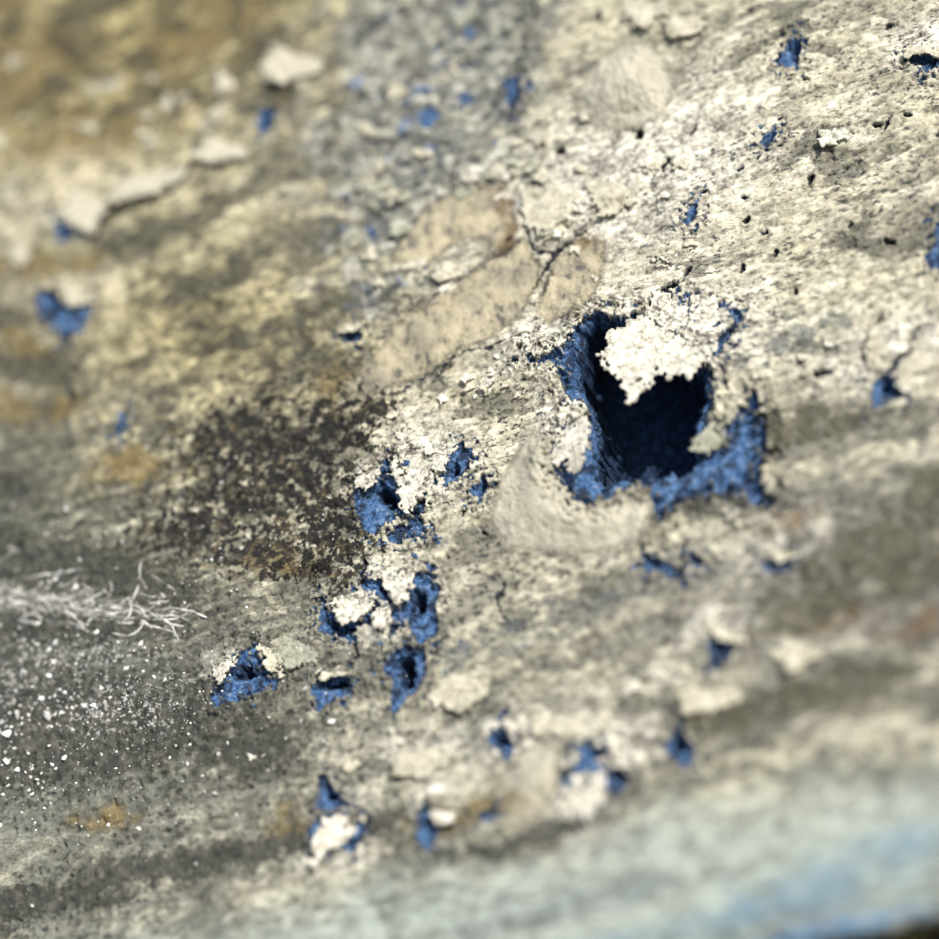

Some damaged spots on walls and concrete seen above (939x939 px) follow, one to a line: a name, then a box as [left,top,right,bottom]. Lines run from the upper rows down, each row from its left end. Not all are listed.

spalling [763,18,813,82]
spalling [893,39,939,86]
peeling [40,41,324,252]
crack [391,162,499,257]
crack [398,252,494,317]
crack [526,231,586,289]
crack [63,375,86,446]
crack [385,328,539,396]
spalling [337,114,791,593]
peeling [819,323,939,420]
spalling [199,561,492,726]
spalling [297,754,380,868]